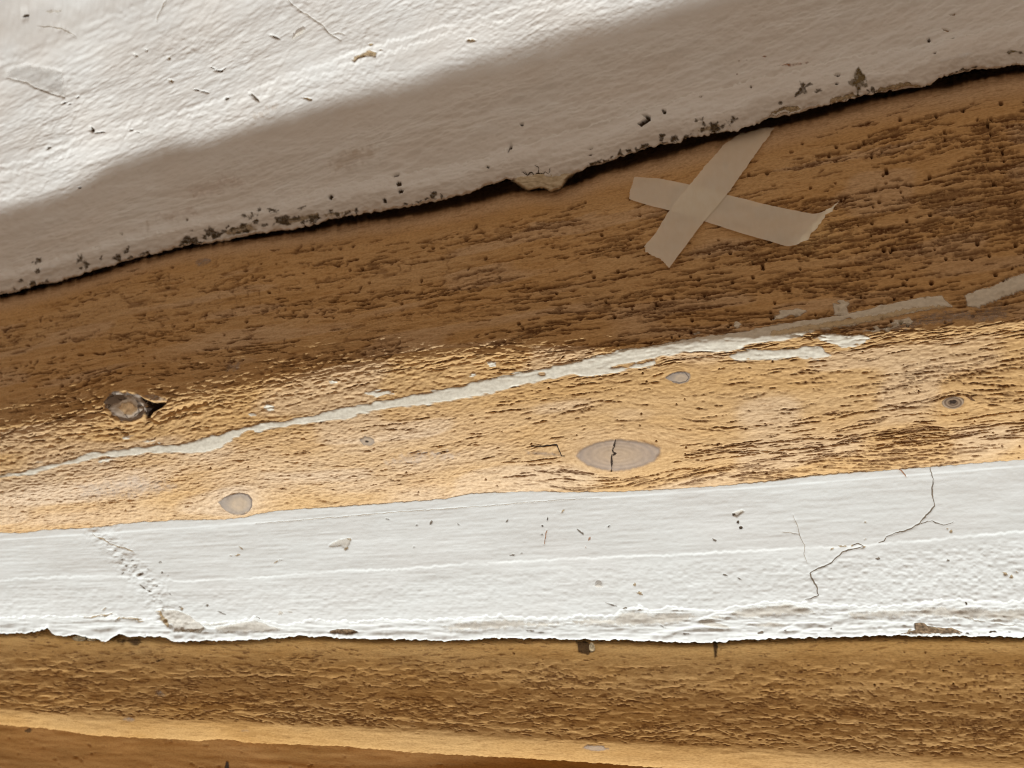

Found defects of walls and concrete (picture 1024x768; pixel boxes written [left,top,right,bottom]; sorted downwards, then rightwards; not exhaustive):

spalling [512,173,575,192]
peeling [772,308,806,320]
peeling [833,300,849,316]
peeling [730,317,913,361]
crack [784,468,953,600]